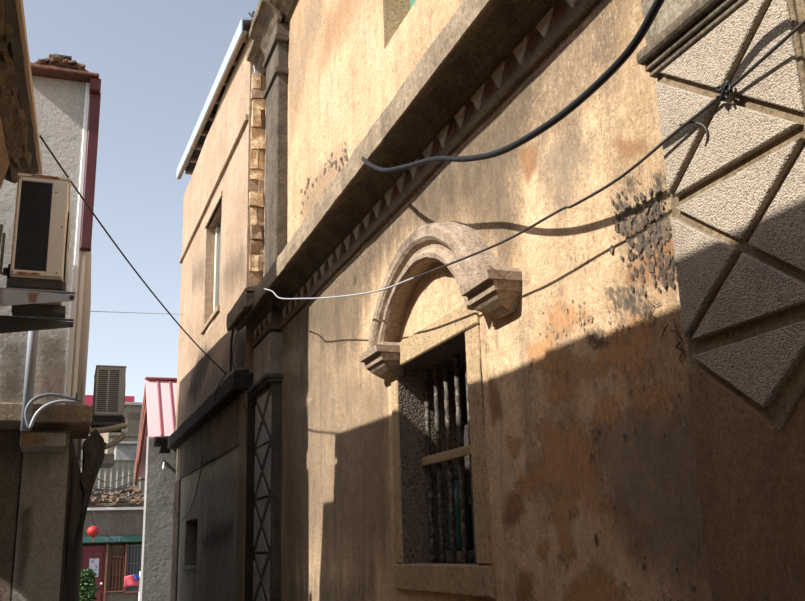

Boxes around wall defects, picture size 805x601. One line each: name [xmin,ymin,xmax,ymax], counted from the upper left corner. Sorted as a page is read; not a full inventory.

water stain [603,166,677,326]
water stain [586,324,609,348]